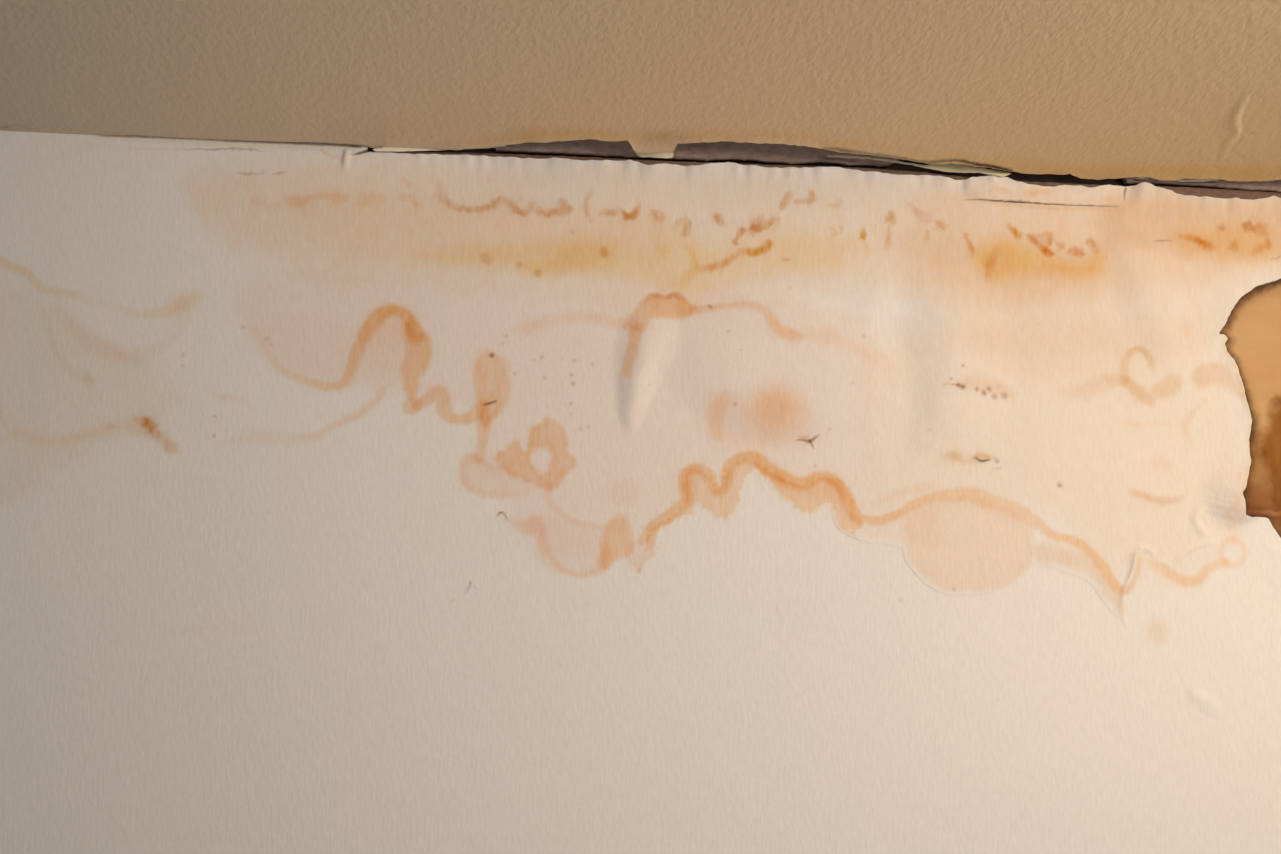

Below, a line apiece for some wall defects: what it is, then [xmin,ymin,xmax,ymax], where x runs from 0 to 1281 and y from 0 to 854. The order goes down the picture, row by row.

damp [0,114,1281,619]
peeling [1219,279,1281,537]